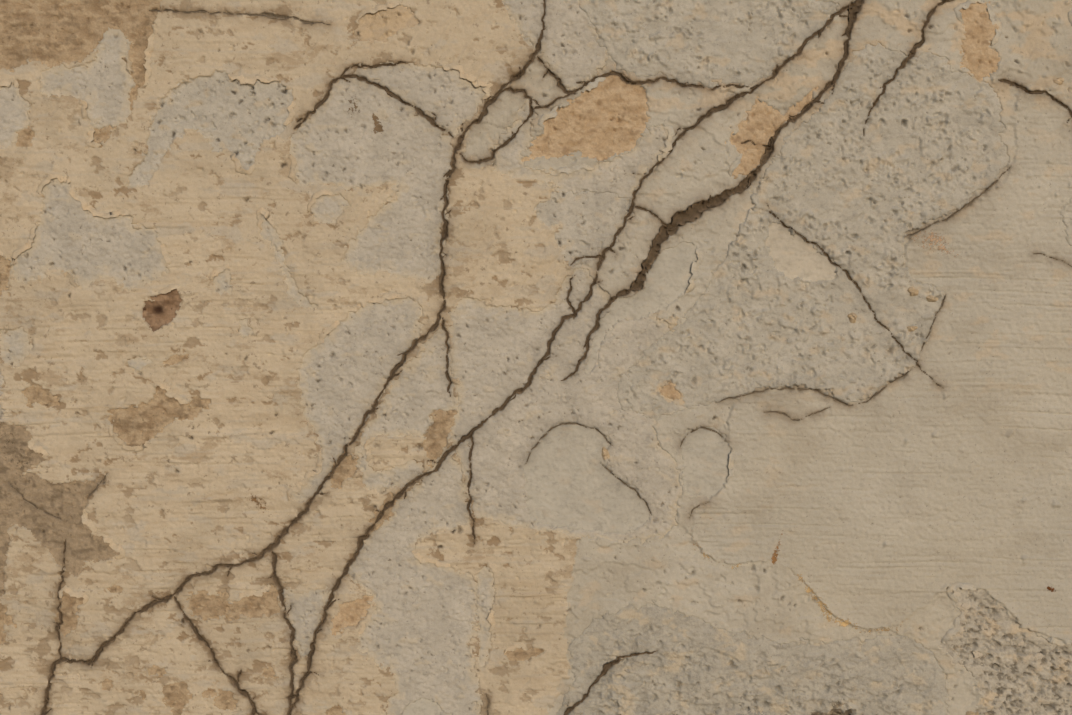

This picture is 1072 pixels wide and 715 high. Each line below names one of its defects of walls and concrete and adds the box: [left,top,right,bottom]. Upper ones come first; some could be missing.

spalling [0,326,126,645]
spalling [0,0,162,149]
peeling [0,173,182,332]
spalling [107,381,211,452]
peeling [123,61,493,283]
crack [8,0,864,715]
peeling [186,0,735,715]
crack [720,205,946,421]
crack [863,0,954,135]
crack [905,167,1011,237]
crack [998,79,1072,126]
spalling [556,582,1072,715]